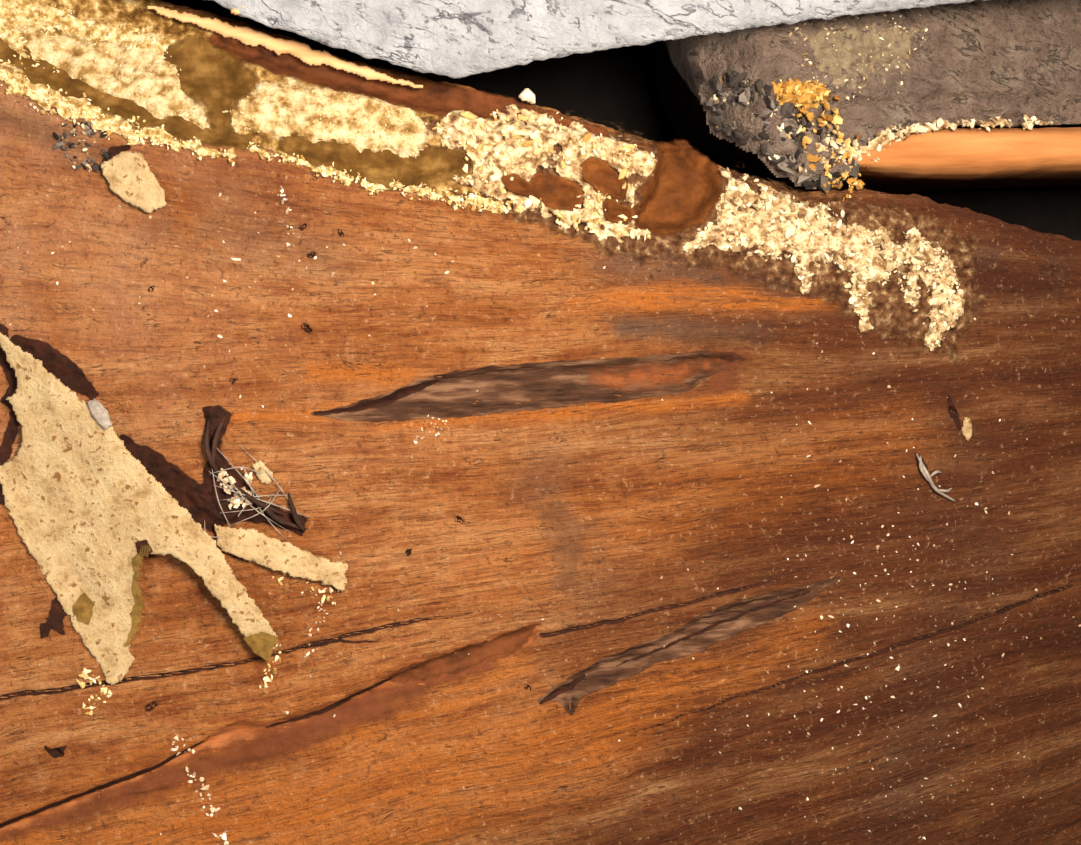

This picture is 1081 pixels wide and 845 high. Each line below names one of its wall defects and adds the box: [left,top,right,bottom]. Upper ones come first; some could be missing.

peeling [0,324,348,685]
crack [0,612,472,700]
crack [266,665,418,728]